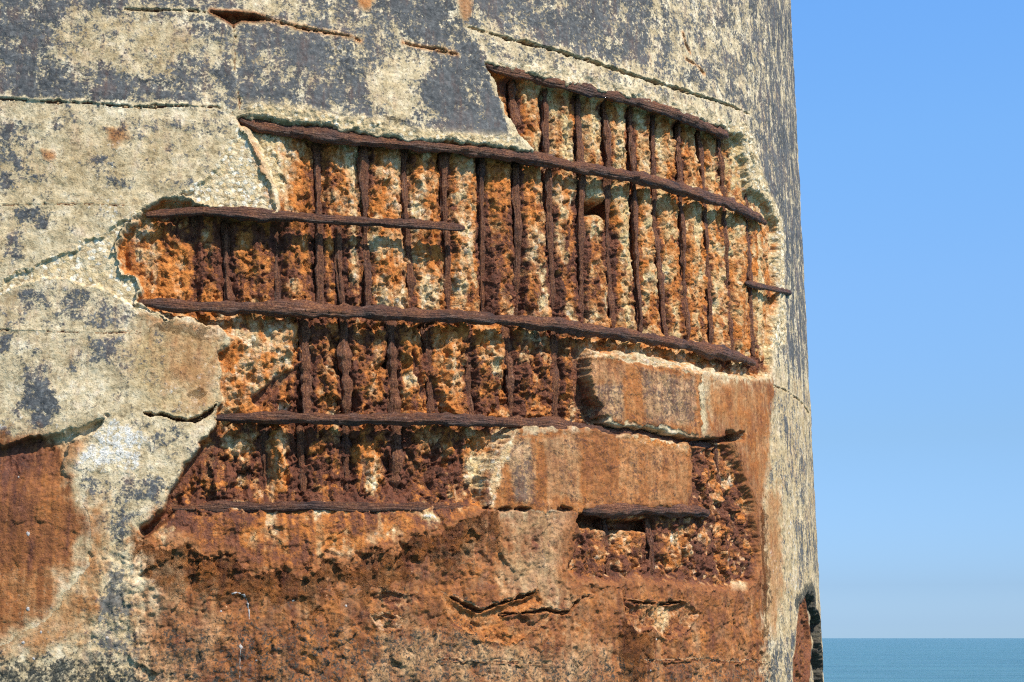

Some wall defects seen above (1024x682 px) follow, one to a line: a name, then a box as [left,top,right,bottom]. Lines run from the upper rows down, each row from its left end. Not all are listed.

crack [262,15,363,43]
crack [141,401,218,424]
rust [135,308,229,426]
spalling [0,45,787,646]
rust [0,372,789,682]
crack [441,590,595,616]
spalling [793,590,823,682]